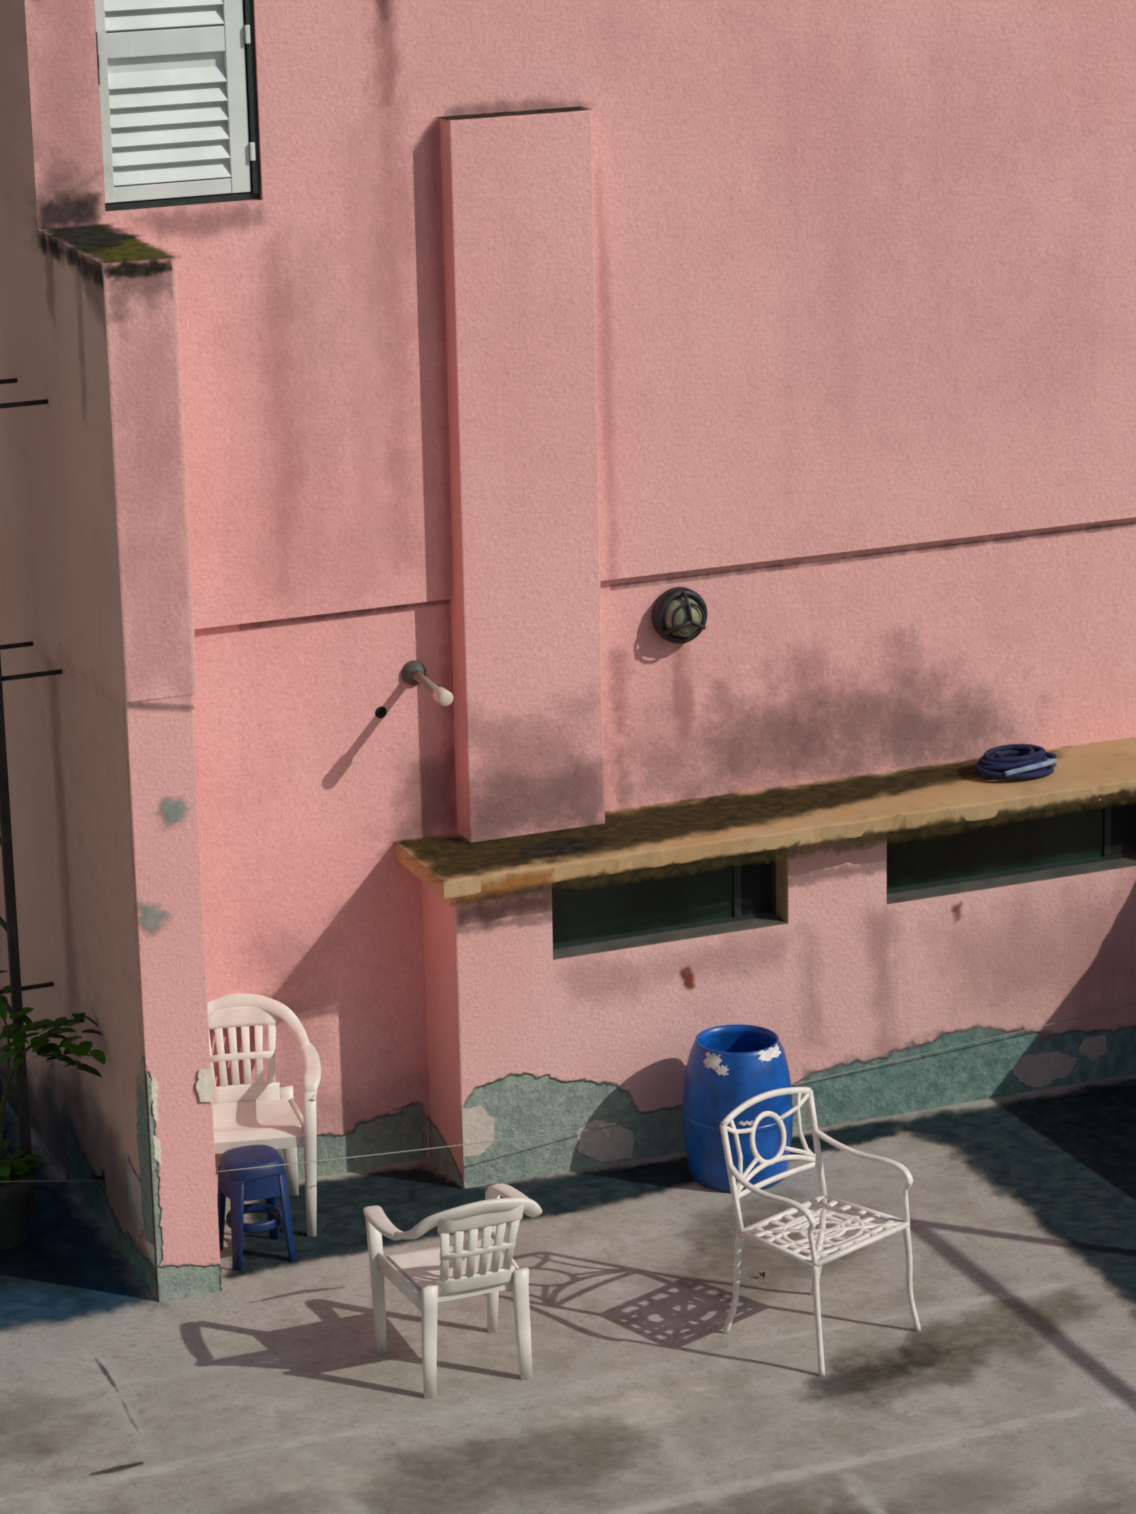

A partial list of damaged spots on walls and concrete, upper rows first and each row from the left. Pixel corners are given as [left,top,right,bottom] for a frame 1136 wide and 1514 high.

water stain [40,194,172,287]
rust [682,967,695,989]
flaking render [126,1056,223,1302]
flaking render [429,1072,686,1188]
flaking render [791,1026,1136,1132]